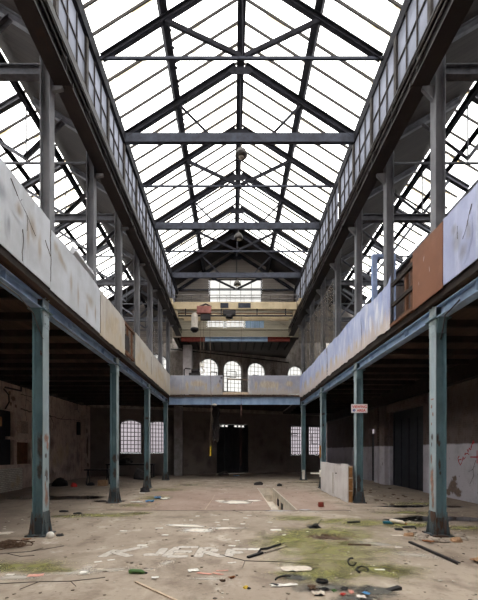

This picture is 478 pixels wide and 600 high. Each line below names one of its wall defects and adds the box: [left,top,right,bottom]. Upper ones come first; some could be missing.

crack [11,179,52,282]
rust [36,426,50,511]